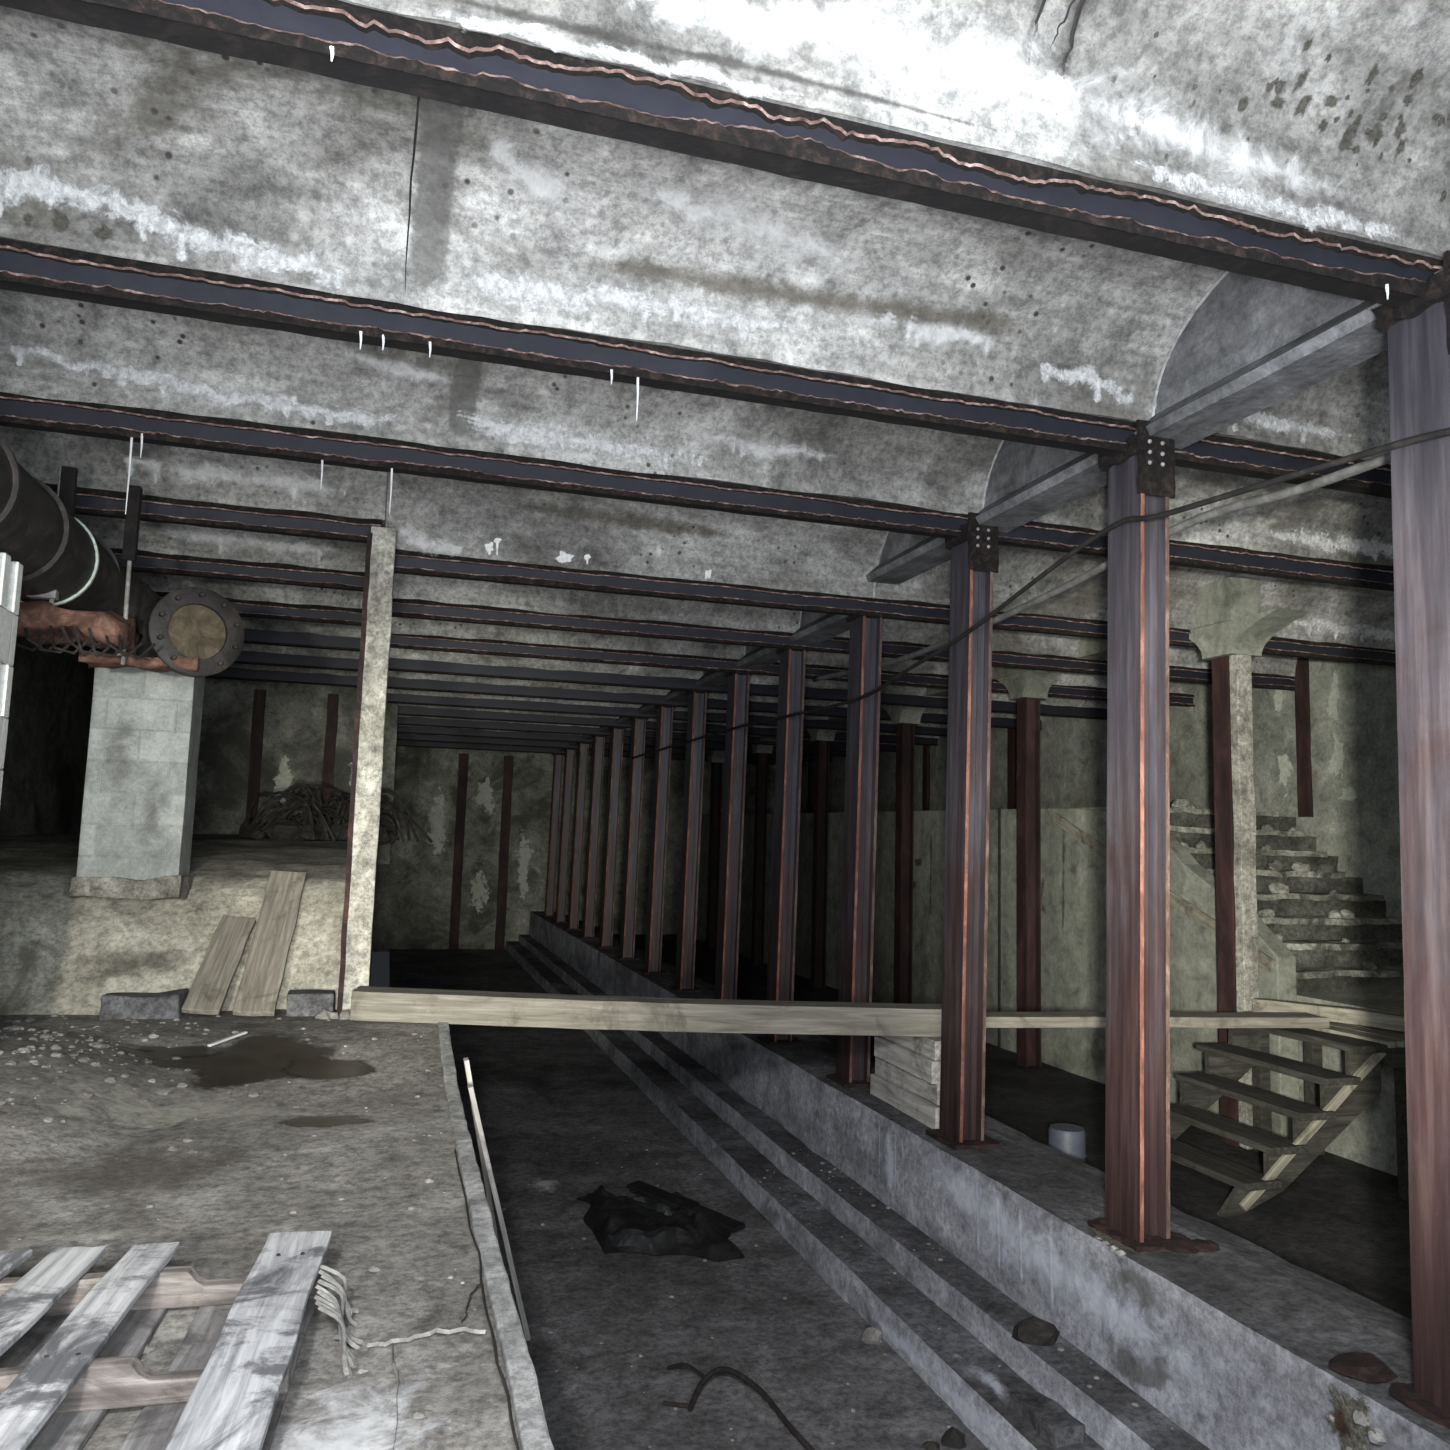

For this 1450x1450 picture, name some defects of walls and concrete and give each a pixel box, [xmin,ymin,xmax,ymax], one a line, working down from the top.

leakage [435,0,1084,134]
crack [1028,0,1086,116]
spalling [1111,73,1151,139]
spalling [1266,64,1423,166]
leakage [0,164,352,289]
leakage [1040,362,1134,404]
leakage [25,1033,375,1133]